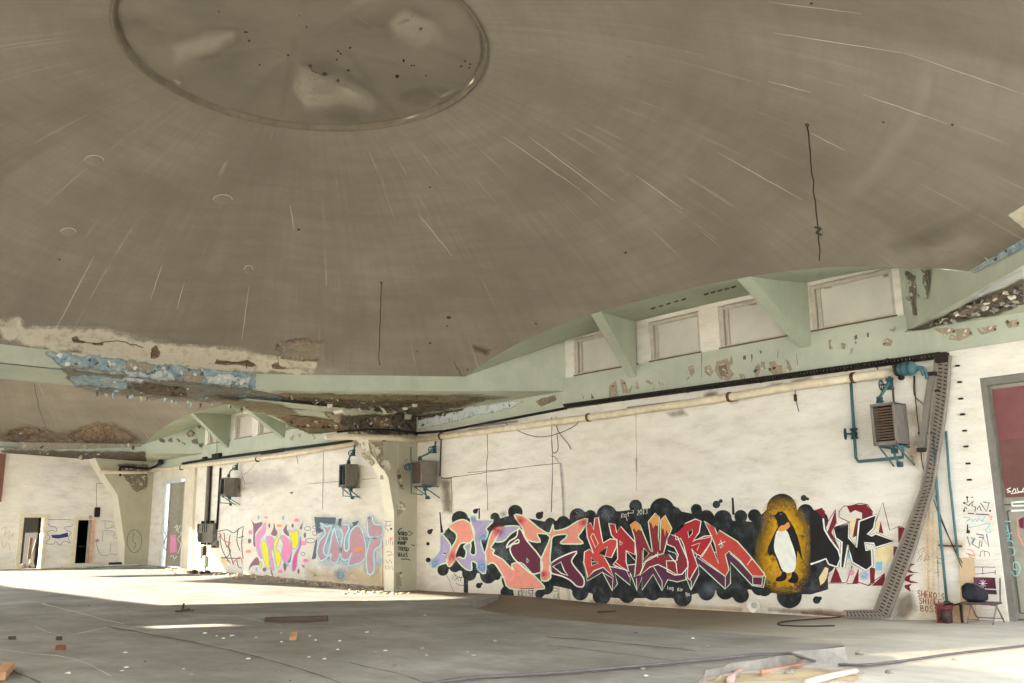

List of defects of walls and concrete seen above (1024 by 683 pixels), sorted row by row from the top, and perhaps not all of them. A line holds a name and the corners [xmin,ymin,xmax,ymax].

peeling [882,269,1024,346]
peeling [0,317,523,516]
peeling [536,395,556,406]
peeling [686,351,792,381]